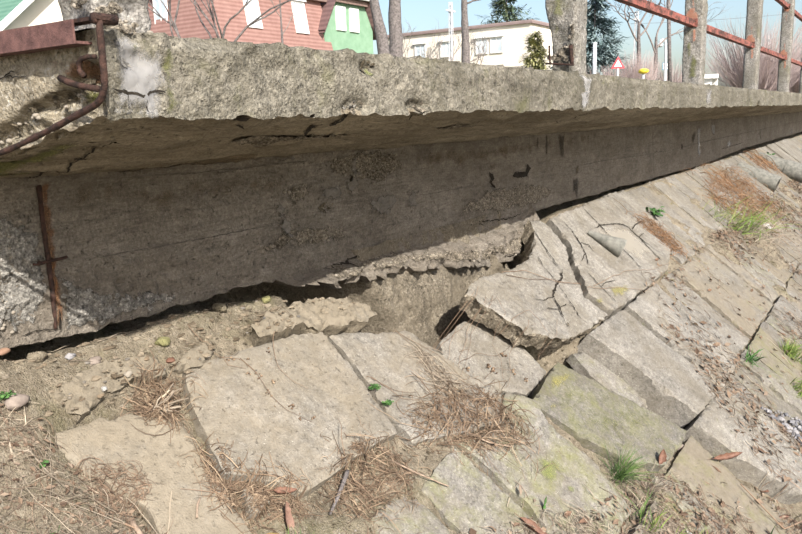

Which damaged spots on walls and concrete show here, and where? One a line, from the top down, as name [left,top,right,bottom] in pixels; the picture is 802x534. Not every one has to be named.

corrosion [68,60,101,82]
crack [234,117,250,129]
crack [29,142,117,178]
spalling [0,185,176,334]
crack [323,255,363,272]
crack [503,234,582,325]
crack [564,213,661,303]
crack [22,310,62,336]